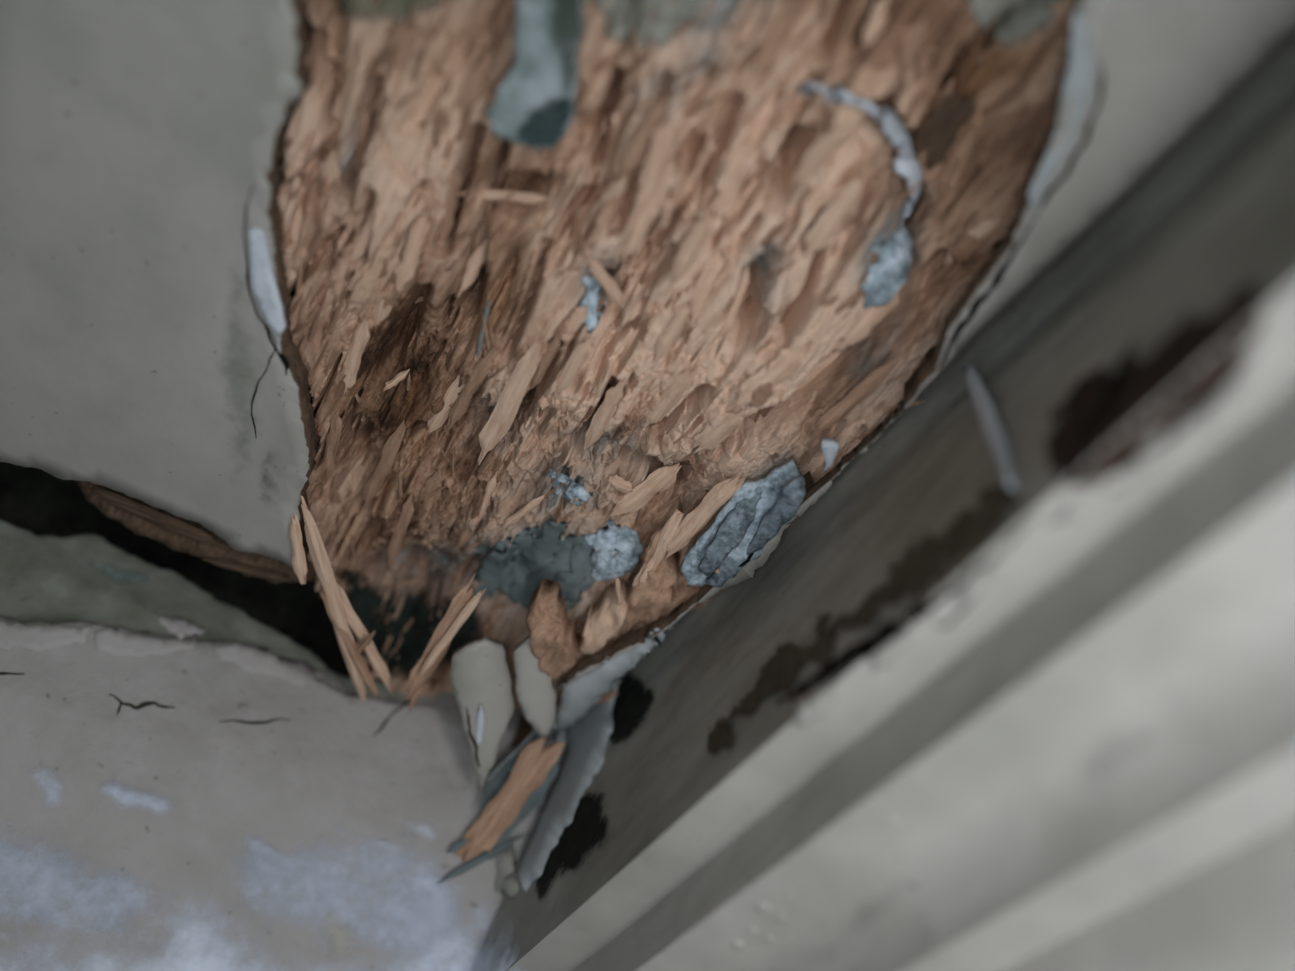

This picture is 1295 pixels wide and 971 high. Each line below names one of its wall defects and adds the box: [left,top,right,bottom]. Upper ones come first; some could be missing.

peeling [484,0,586,150]
peeling [795,81,923,308]
peeling [681,459,806,587]
peeling [707,363,1037,756]
crack [0,669,24,677]
crack [109,694,175,715]
peeling [450,635,557,789]
damp [0,849,144,927]
damp [105,786,167,811]
damp [132,921,262,971]
damp [247,841,513,971]
peeling [535,793,606,899]